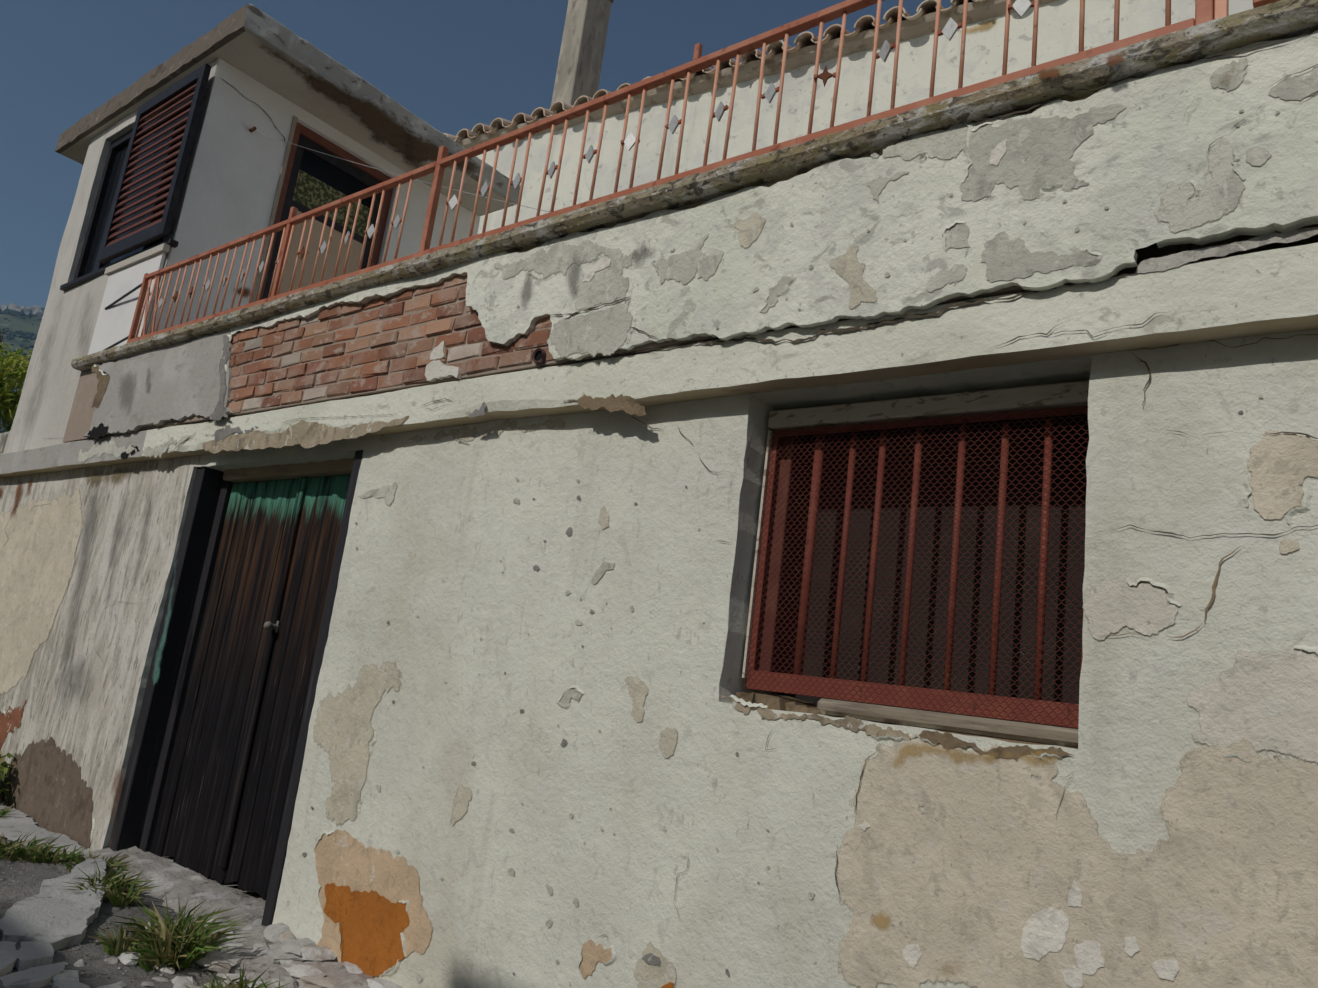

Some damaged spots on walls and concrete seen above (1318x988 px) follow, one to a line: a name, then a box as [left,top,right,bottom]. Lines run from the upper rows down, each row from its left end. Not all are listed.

spalling [78,234,724,463]
peeling [734,212,765,248]
peeling [752,265,813,313]
peeling [830,245,877,309]
peeling [1243,430,1318,554]
peeling [0,487,95,849]
peeling [1083,577,1181,640]
crack [1097,524,1318,638]
peeling [302,661,433,978]
peeling [720,645,1318,988]